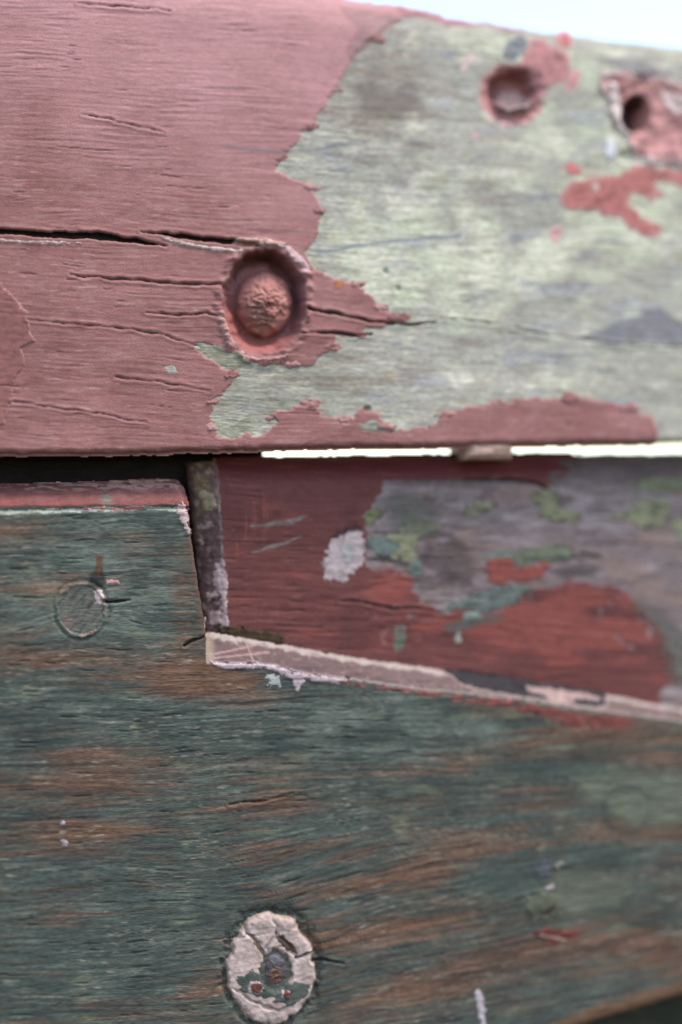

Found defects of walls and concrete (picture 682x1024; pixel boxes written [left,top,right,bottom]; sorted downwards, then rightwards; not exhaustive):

peeling [478,30,583,128]
peeling [558,69,682,238]
crack [0,229,286,252]
crack [70,274,221,286]
peeling [372,304,411,322]
crack [38,312,225,346]
peeling [320,523,401,583]
peeling [485,557,552,586]
peeling [392,626,406,652]
peeling [455,612,482,643]
peeling [341,668,636,731]